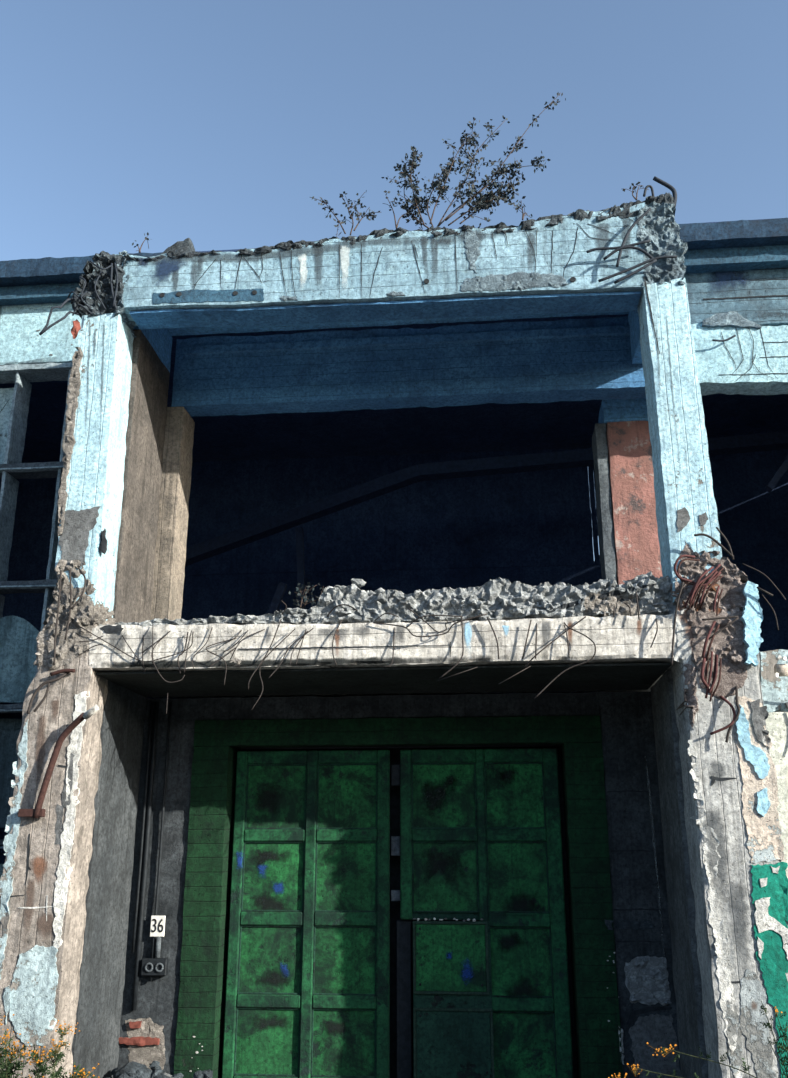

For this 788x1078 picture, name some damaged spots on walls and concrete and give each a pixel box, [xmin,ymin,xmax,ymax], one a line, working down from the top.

spalling [36,253,125,336]
leakage [138,258,181,281]
leakage [299,255,307,282]
leakage [340,246,350,280]
spalling [586,176,681,284]
crack [703,268,788,300]
crack [720,327,788,381]
spalling [499,592,641,699]
rust [680,584,721,638]
peeling [0,344,314,1047]
spalling [671,507,788,1078]
peeling [607,952,682,1078]